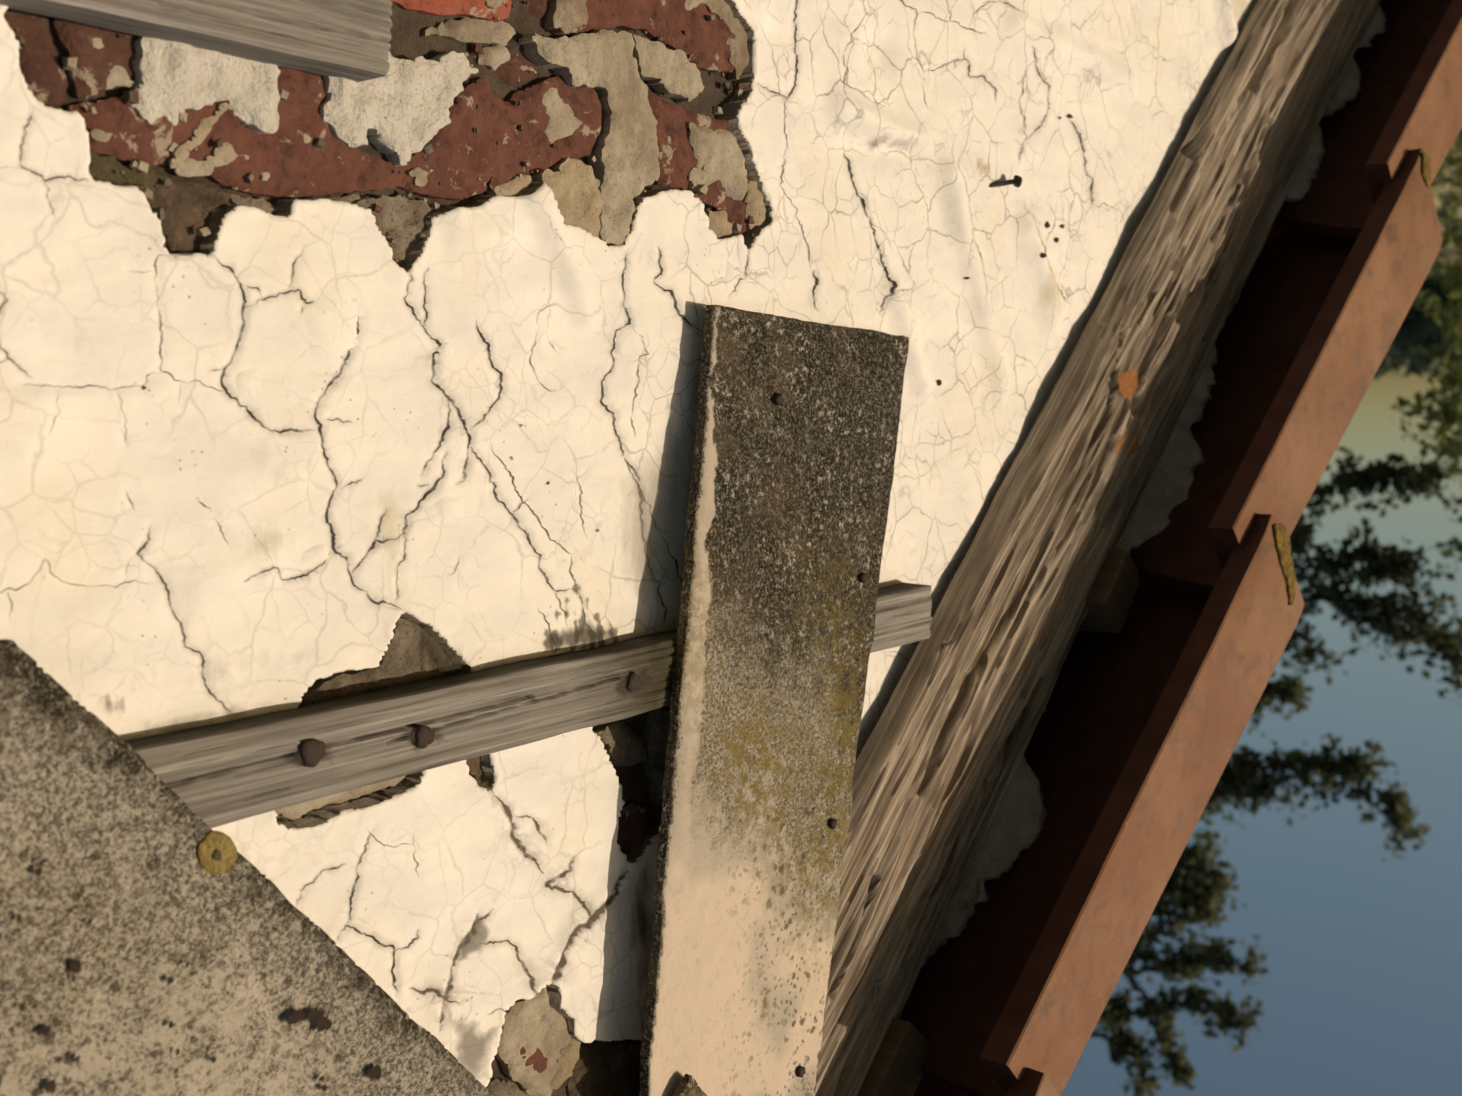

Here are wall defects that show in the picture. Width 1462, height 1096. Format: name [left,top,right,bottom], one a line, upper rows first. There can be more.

spalling [3,0,766,265]
crack [763,0,819,308]
crack [844,155,909,311]
crack [900,0,1112,207]
crack [0,255,590,638]
crack [600,249,703,623]
crack [0,497,230,711]
spalling [275,775,406,820]
spalling [299,618,453,706]
spalling [466,756,484,780]
crack [297,796,628,1023]
spalling [486,988,642,1096]